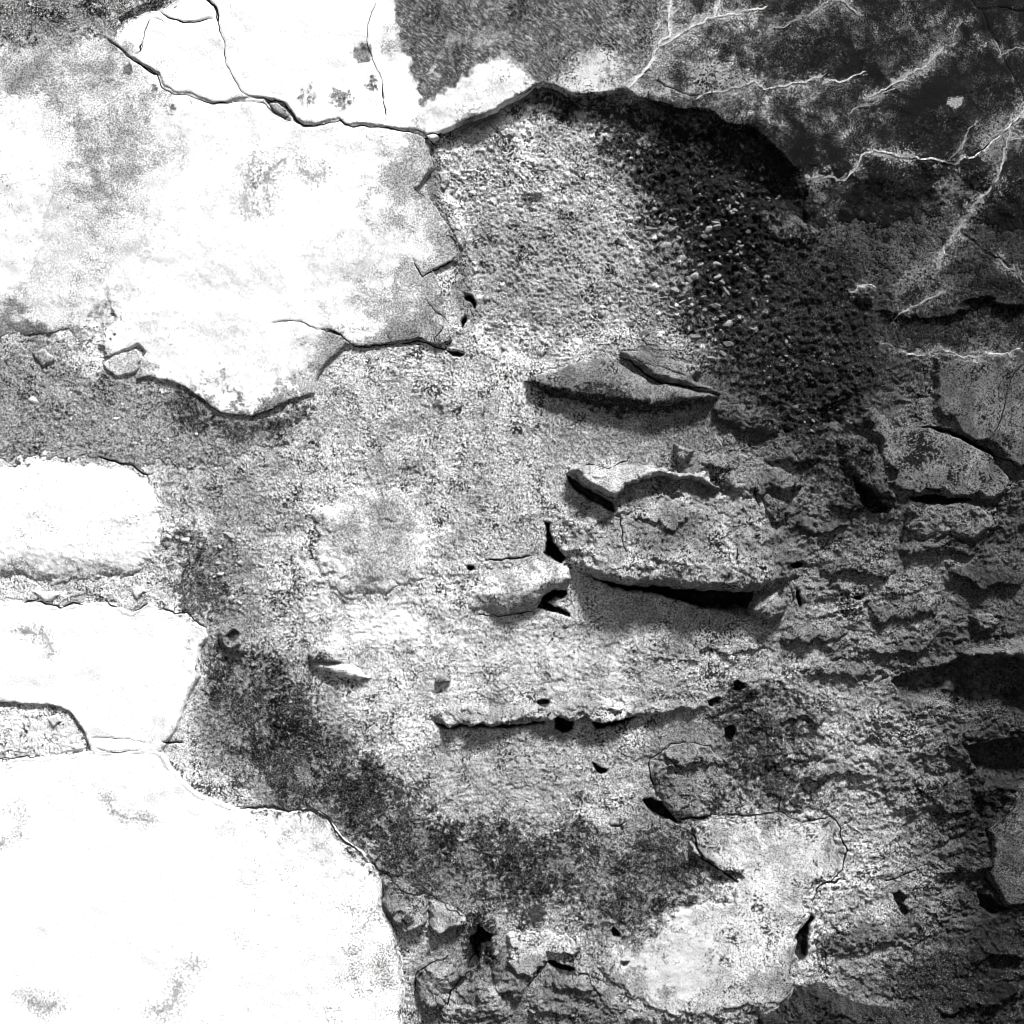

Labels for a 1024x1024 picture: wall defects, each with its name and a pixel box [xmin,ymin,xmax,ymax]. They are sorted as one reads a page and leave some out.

crack [106,0,442,146]
crack [658,74,716,96]
spalling [0,31,811,470]
leakage [65,0,1024,557]
crack [961,232,1020,279]
spalling [863,359,1024,500]
spalling [0,565,405,1024]
leakage [153,518,839,1024]
crack [648,742,715,785]
spalling [689,811,837,910]
crack [679,800,853,902]
spalling [506,930,582,978]